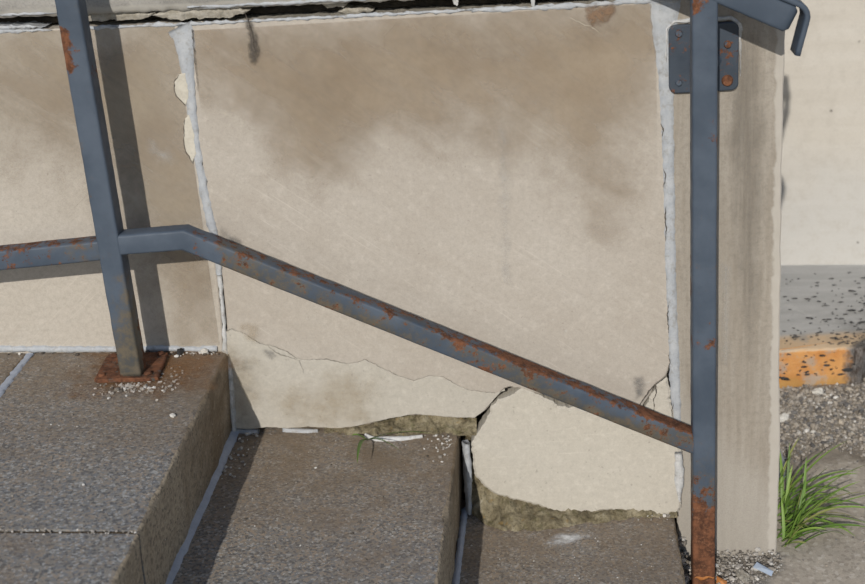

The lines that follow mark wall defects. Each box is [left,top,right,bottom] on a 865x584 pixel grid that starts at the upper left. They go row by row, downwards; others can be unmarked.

peeling [174,73,196,163]
water stain [202,10,653,161]
crack [226,328,495,393]
crack [640,355,673,417]
spalling [324,415,678,532]